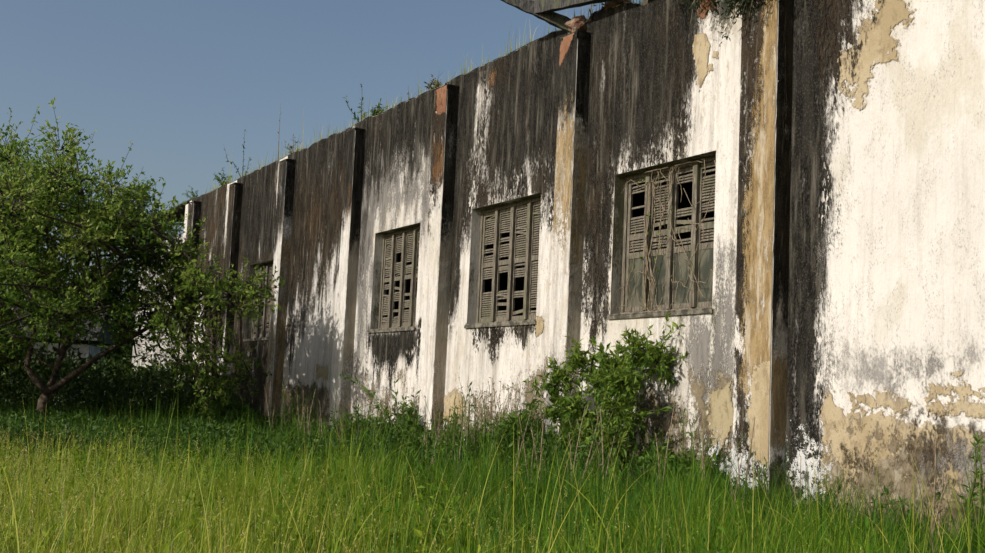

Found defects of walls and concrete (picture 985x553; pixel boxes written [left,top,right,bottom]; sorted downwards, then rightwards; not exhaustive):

peeling [692,32,719,92]
spalling [697,0,717,20]
peeling [837,0,917,111]
leakage [181,0,702,429]
leakage [589,0,985,531]
leakage [431,352,565,444]
peeling [785,371,985,523]